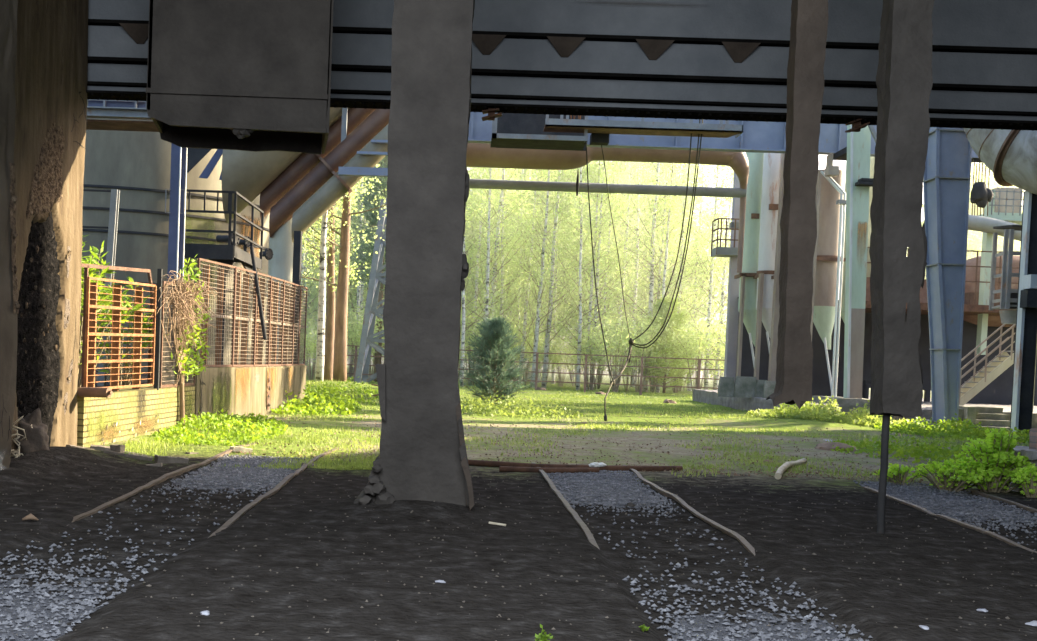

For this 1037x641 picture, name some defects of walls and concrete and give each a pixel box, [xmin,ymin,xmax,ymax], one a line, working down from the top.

spalling [16,122,73,447]